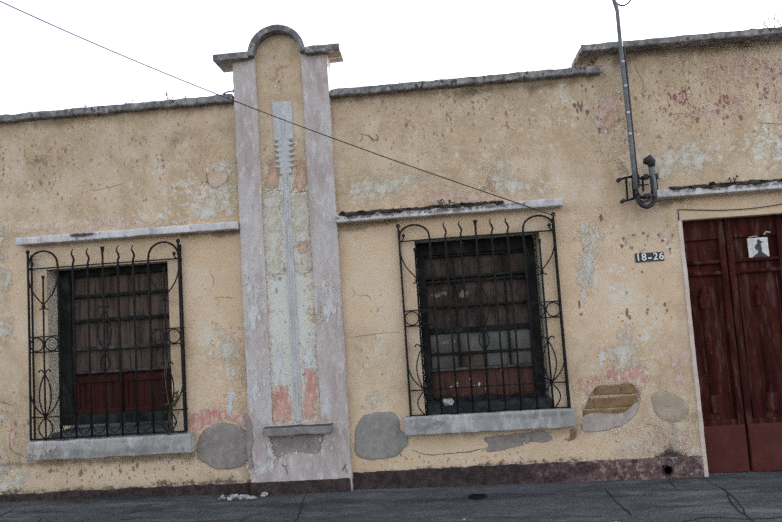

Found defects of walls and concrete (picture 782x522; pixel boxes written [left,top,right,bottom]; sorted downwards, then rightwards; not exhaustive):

peeling [191,156,237,222]
peeling [263,157,312,274]
peeling [336,165,484,209]
peeling [483,155,555,201]
peeling [187,280,265,432]
peeling [250,332,320,423]
spalling [568,308,649,435]
crack [682,480,782,522]